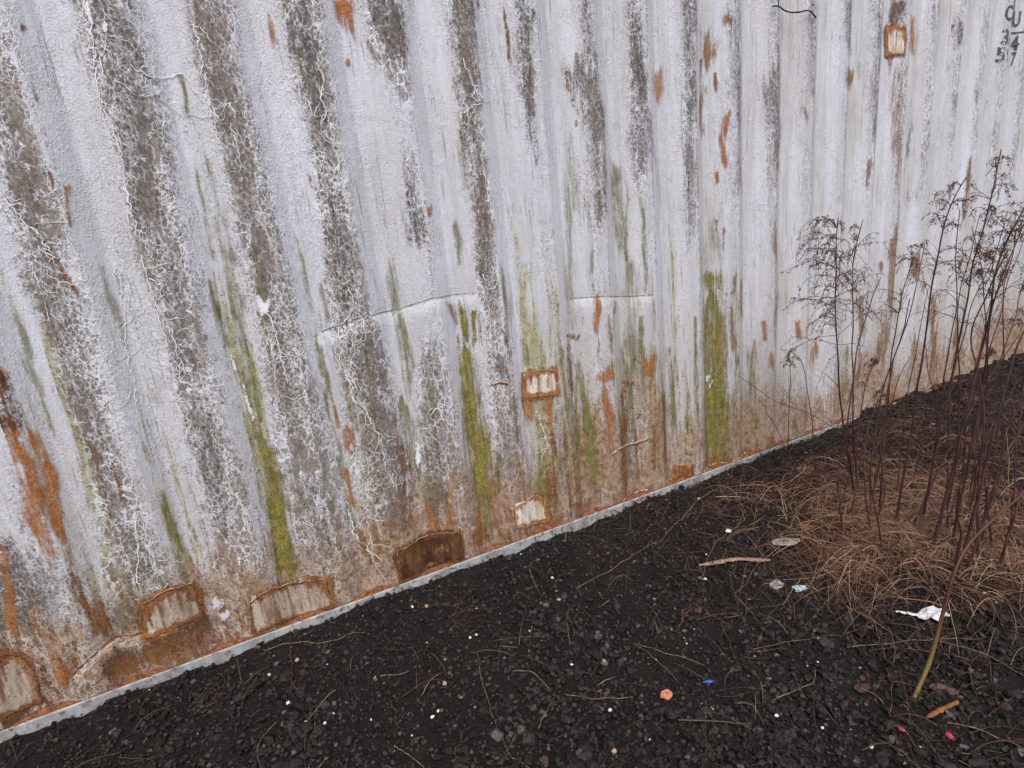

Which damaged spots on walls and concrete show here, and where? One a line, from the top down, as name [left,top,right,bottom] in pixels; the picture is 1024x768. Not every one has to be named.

rust [0,366,117,636]
water stain [0,102,163,647]
water stain [190,0,303,457]
water stain [284,0,421,536]
water stain [403,178,427,248]
water stain [451,0,498,346]
rust [392,334,582,592]
rust [596,364,802,491]
water stain [704,271,724,292]
rust [884,0,922,203]
rust [0,546,77,729]
rust [98,575,343,689]